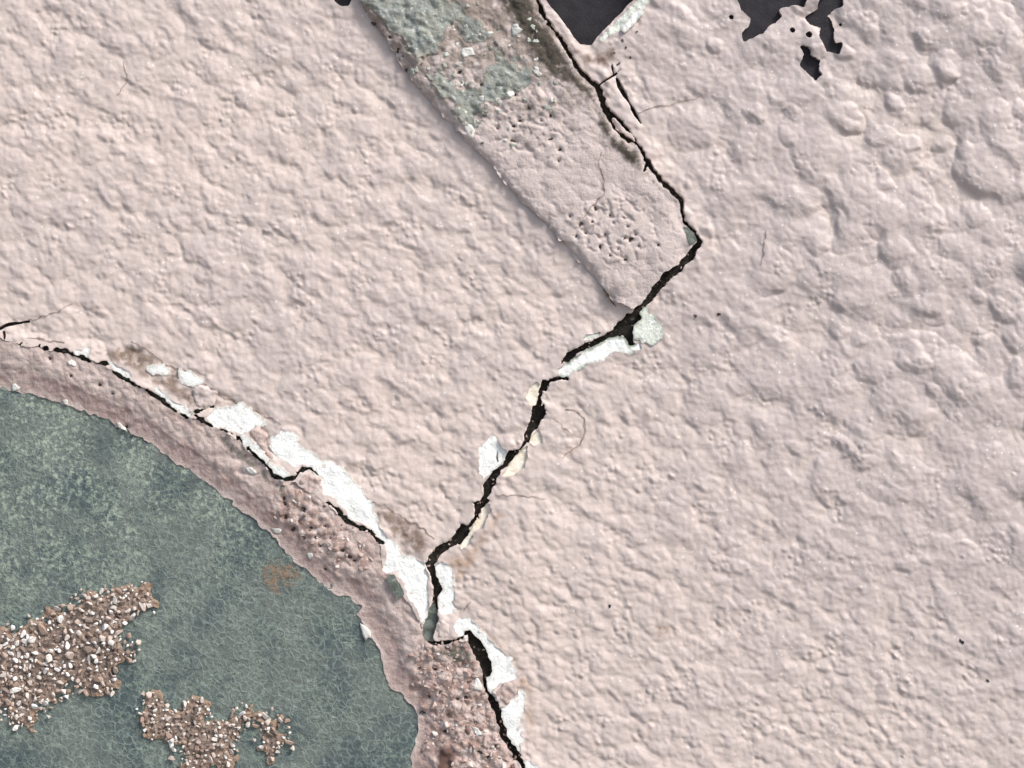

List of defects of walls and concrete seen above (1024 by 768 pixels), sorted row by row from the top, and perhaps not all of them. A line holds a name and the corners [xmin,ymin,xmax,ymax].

peeling [334,0,555,147]
peeling [599,0,651,65]
peeling [729,0,843,80]
peeling [67,345,91,378]
peeling [108,362,132,382]
crack [0,303,318,481]
crack [326,0,702,768]
peeling [135,363,543,768]
spalling [0,581,159,733]